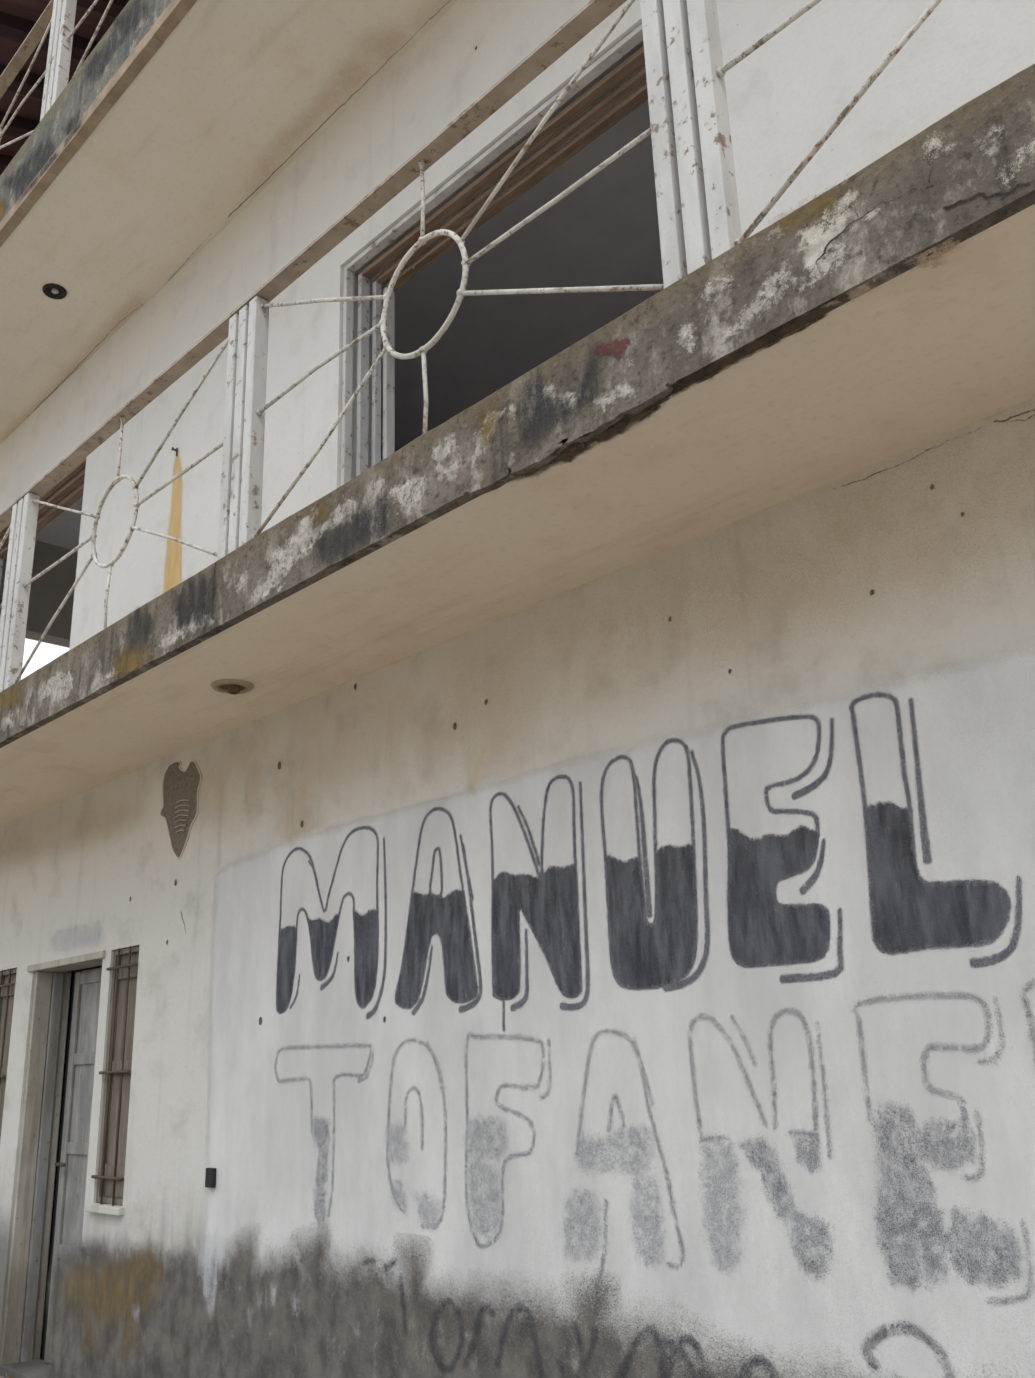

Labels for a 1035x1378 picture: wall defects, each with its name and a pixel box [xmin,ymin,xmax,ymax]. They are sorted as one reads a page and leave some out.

leakage [80,0,151,87]
leakage [3,110,81,204]
peeling [921,130,956,161]
peeling [973,120,1035,191]
peeling [699,274,735,309]
peeling [720,168,883,340]
peeling [673,321,698,354]
leakage [509,340,605,463]
peeling [541,351,636,413]
leakage [312,488,396,568]
leakage [123,566,217,652]
leakage [44,1219,908,1378]